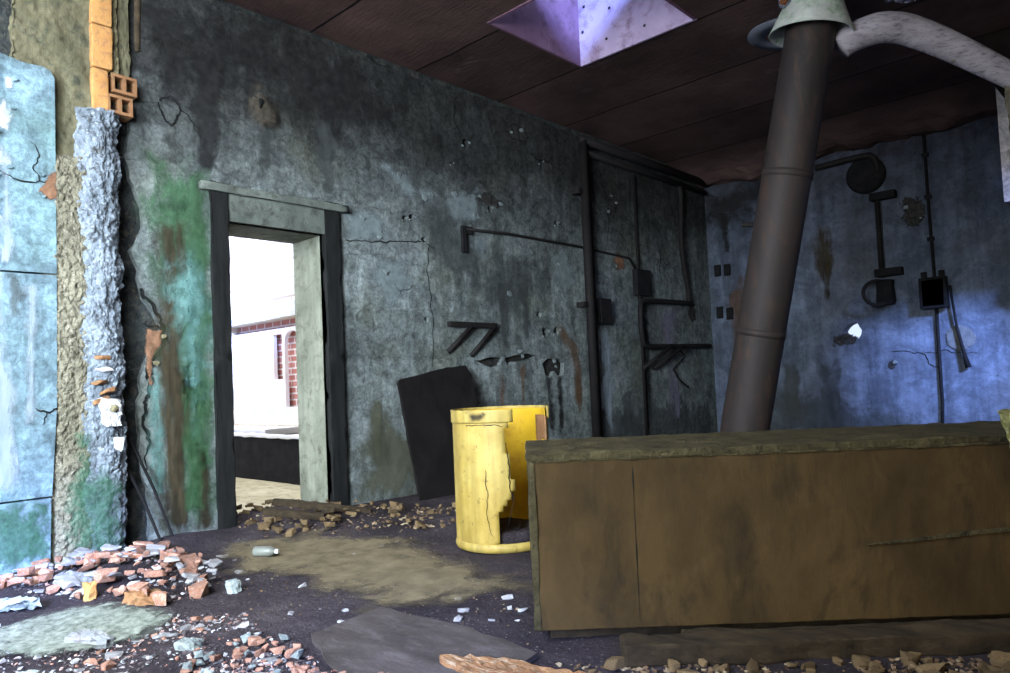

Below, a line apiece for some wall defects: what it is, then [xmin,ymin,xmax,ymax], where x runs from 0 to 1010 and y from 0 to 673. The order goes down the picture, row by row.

crack [158,95,201,142]
water stain [2,202,11,261]
crack [140,288,180,470]
water stain [151,226,206,526]
water stain [197,449,210,529]